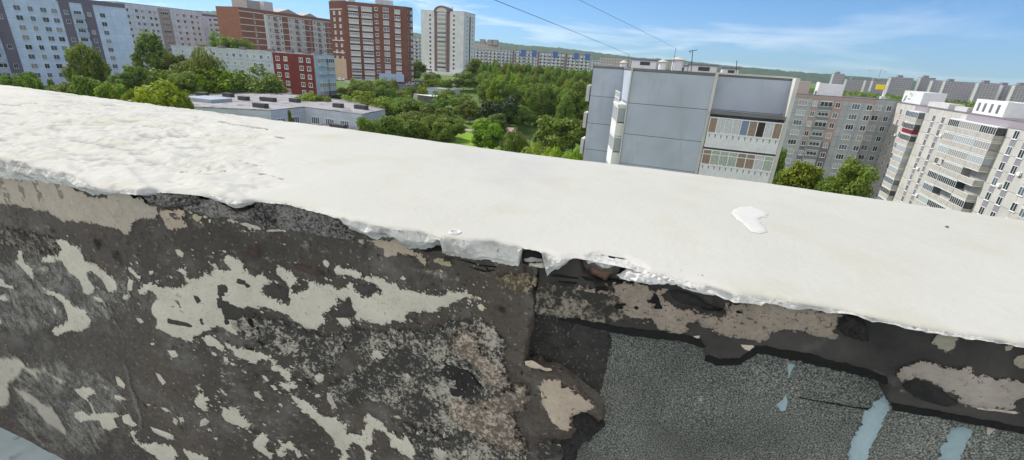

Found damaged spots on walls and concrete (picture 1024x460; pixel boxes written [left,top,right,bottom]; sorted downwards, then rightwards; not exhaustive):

spalling [0,177,594,460]
peeling [496,249,848,351]
peeling [897,334,1024,414]